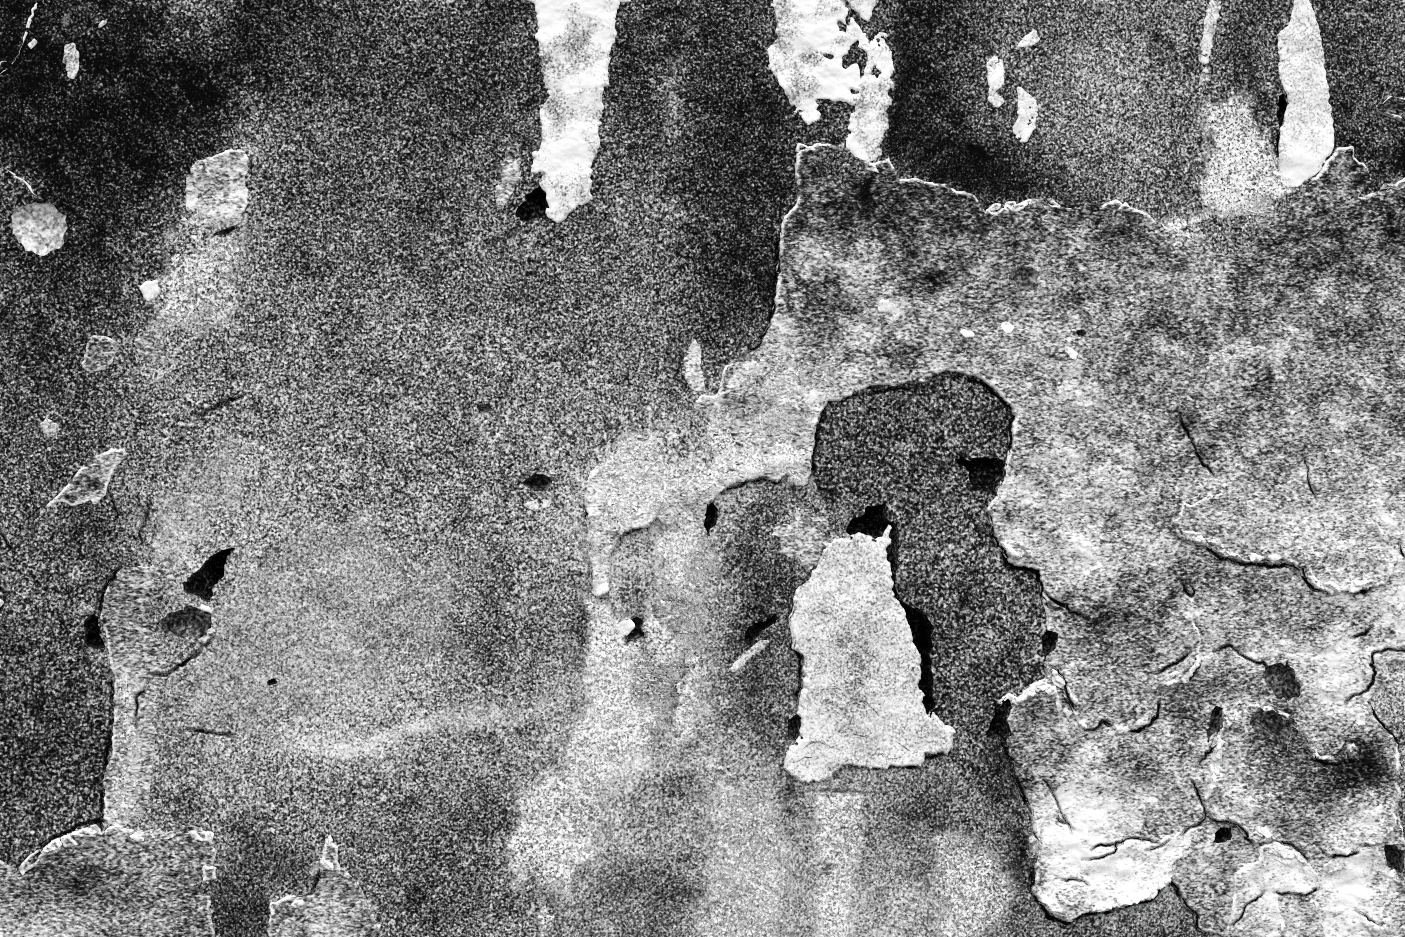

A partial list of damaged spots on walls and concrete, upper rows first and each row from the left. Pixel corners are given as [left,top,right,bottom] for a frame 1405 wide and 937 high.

crack [0,3,44,74]
peeling [495,0,631,223]
peeling [767,0,895,173]
peeling [1277,0,1334,188]
water stain [151,216,248,333]
spalling [683,329,1202,787]
crack [1154,645,1269,674]
crack [1348,627,1405,701]
peeling [0,565,217,937]
peeling [1026,813,1196,922]
crack [1044,744,1253,886]
crack [1232,890,1315,926]